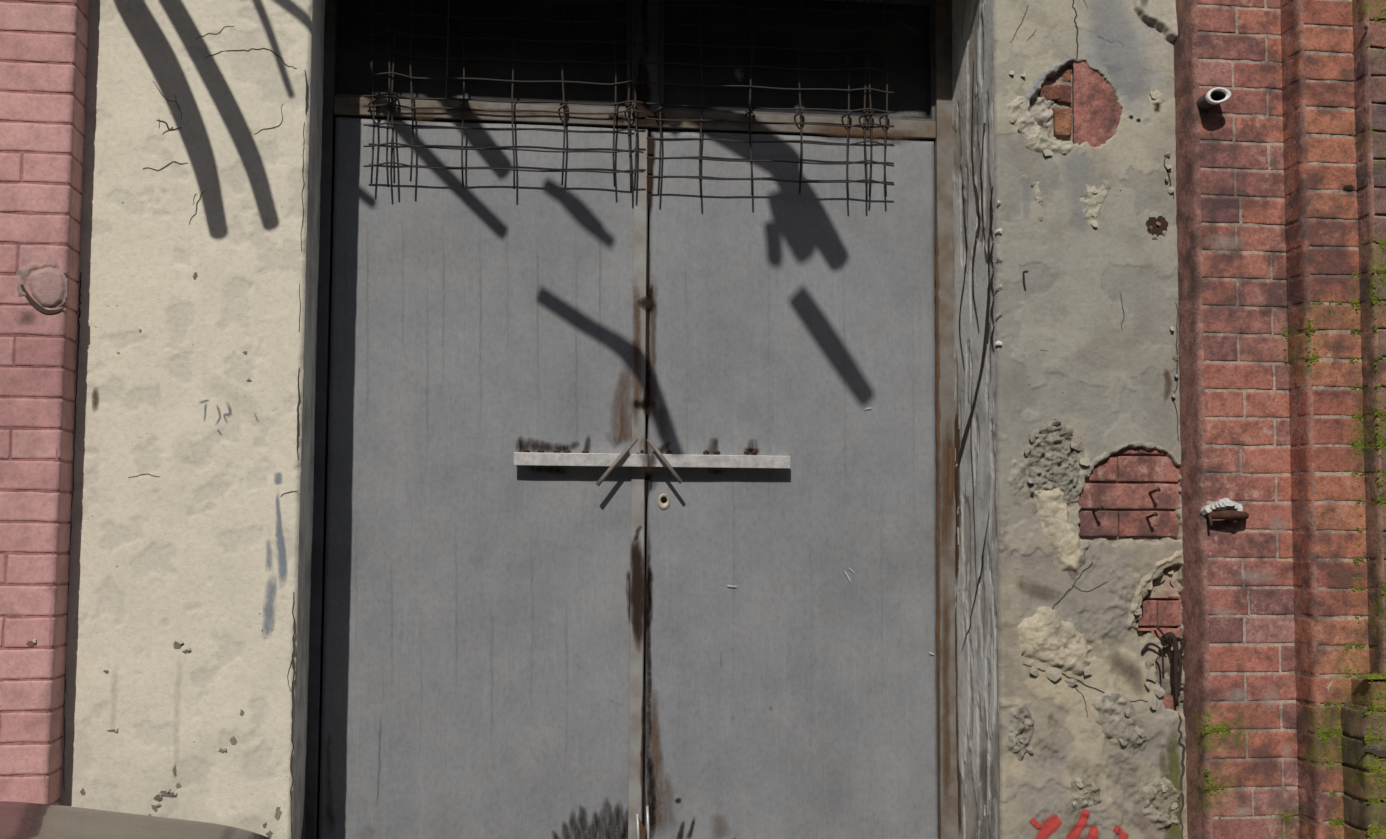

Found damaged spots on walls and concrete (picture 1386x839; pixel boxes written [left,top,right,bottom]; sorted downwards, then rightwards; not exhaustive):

crack [1072,0,1124,59]
crack [143,82,207,224]
crack [196,26,308,251]
spalling [1007,56,1141,157]
peeling [1079,179,1111,227]
spalling [1146,216,1168,240]
crack [294,367,302,457]
corrosion [617,300,640,439]
spalling [1006,417,1186,761]